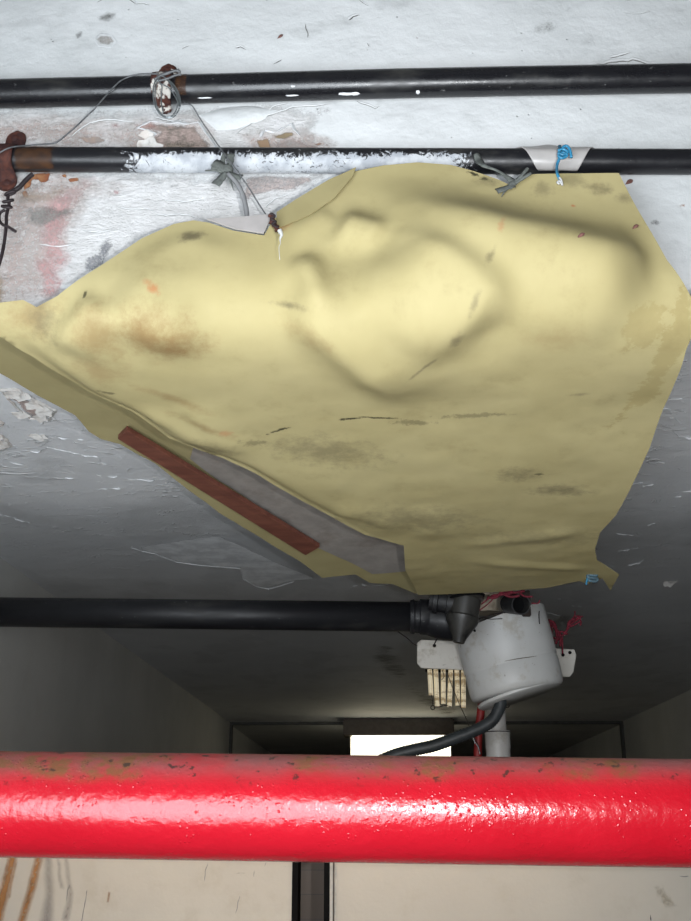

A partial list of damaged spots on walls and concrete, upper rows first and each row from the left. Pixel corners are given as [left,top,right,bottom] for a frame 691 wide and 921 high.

peeling [0,107,324,148]
peeling [0,388,57,423]
peeling [130,537,313,590]